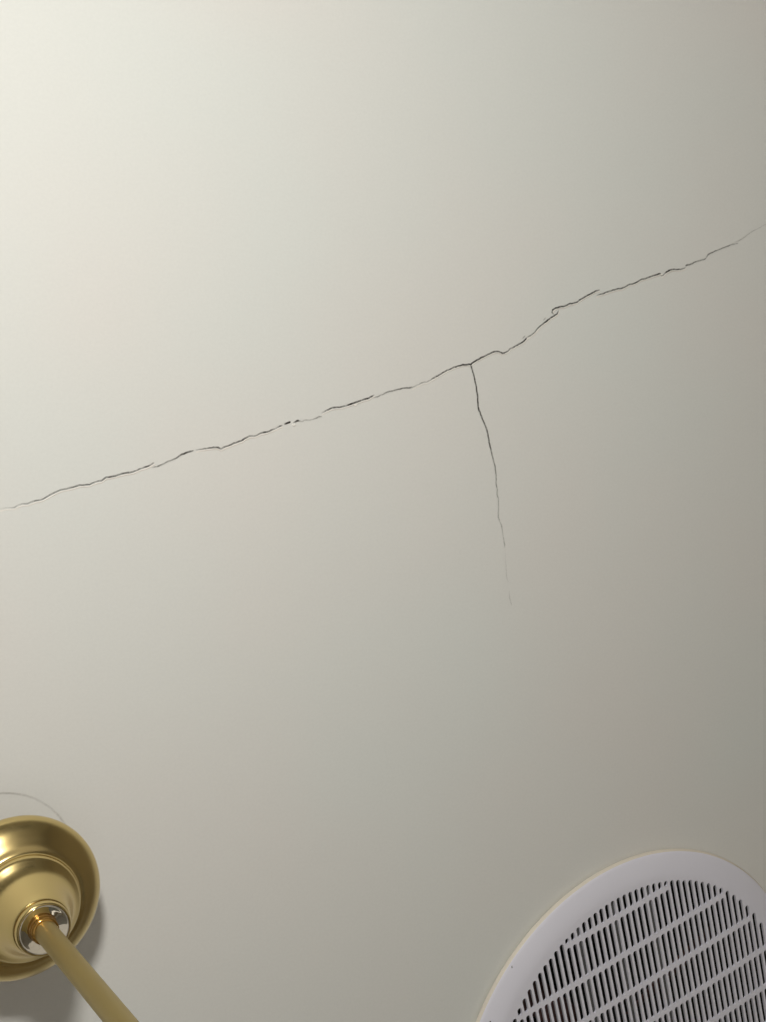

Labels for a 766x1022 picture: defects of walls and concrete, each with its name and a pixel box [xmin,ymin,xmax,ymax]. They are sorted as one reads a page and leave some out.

crack [0,420,299,512]
crack [322,248,722,471]